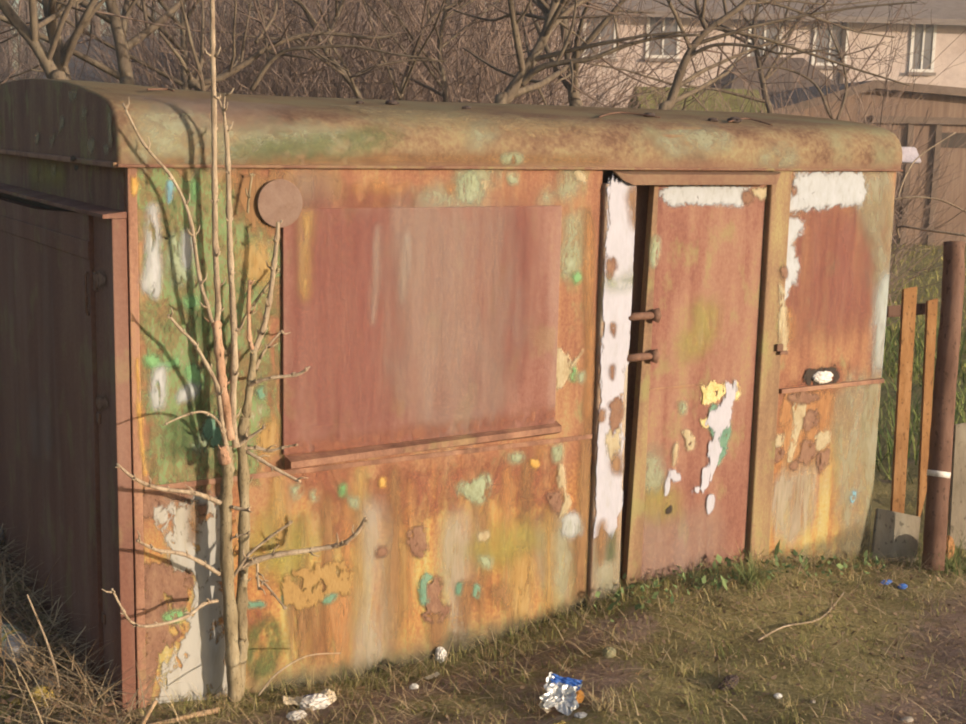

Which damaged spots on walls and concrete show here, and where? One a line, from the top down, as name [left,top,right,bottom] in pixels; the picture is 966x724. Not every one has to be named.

rust [741,191,754,205]
peeling [752,187,767,200]
peeling [664,430,695,496]
peeling [695,380,742,514]
rust [774,364,844,512]
peeling [154,496,228,704]